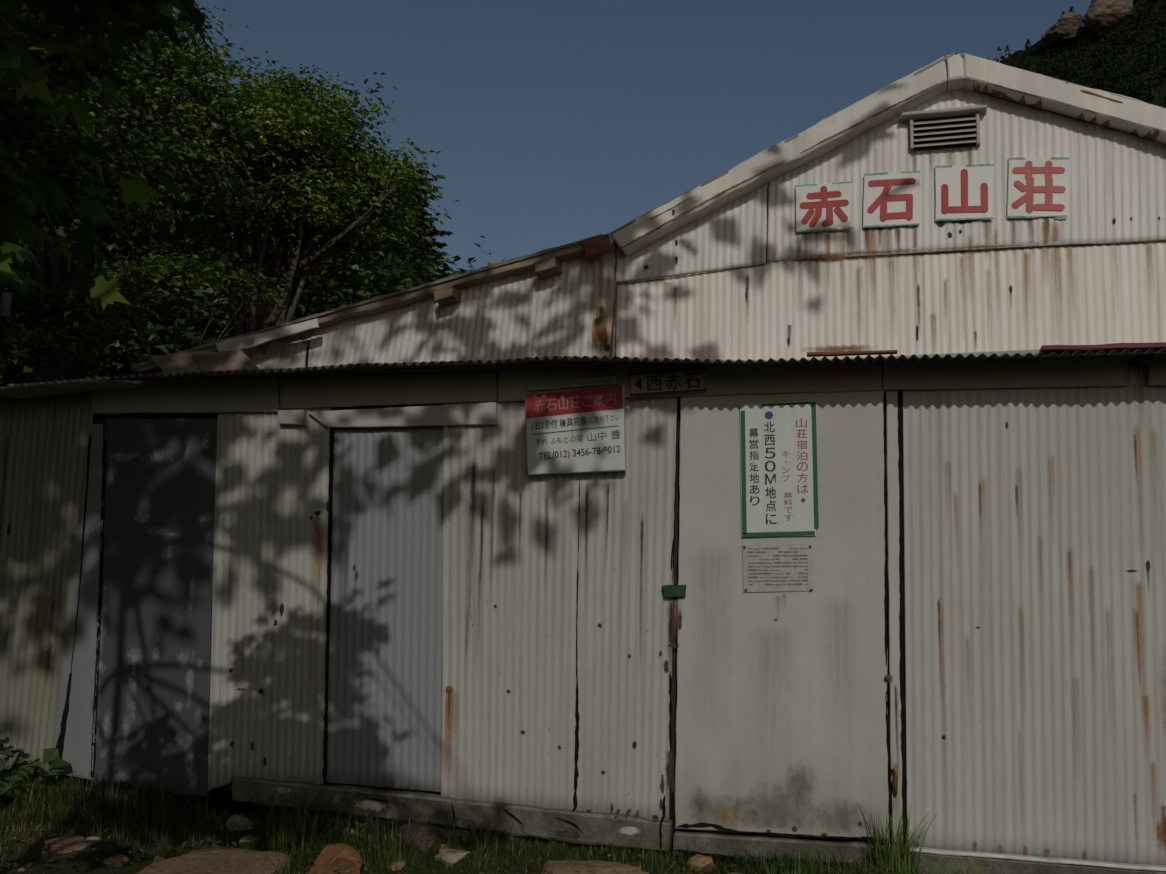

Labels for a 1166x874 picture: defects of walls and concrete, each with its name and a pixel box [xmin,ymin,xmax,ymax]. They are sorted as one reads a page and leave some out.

rust [973,80,1161,141]
rust [799,228,916,267]
rust [1030,217,1072,265]
rust [593,308,610,351]
peeling [93,644,160,784]
peeling [176,653,203,722]
rust [446,686,456,722]
rust [1157,806,1166,842]